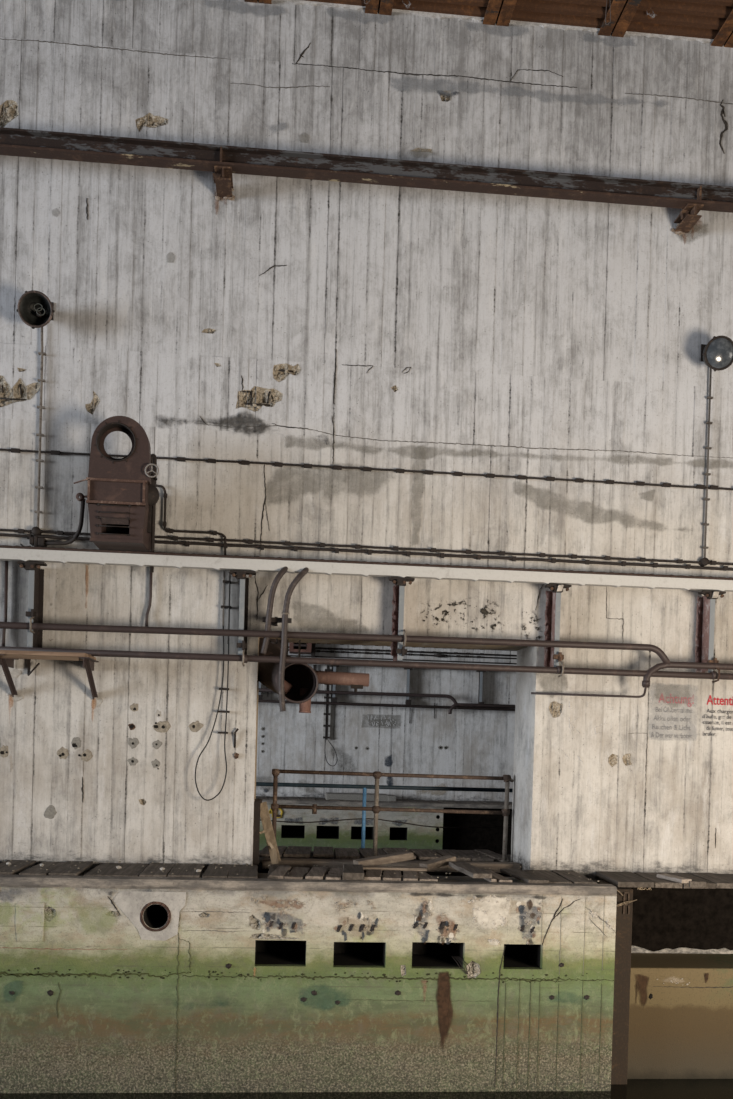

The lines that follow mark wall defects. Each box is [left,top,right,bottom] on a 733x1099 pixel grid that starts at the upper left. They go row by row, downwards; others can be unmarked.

spalling [0,100,19,127]
spalling [135,113,168,132]
crack [625,93,733,154]
spalling [0,368,40,407]
spalling [236,363,301,412]
peeling [249,896,307,940]
peeling [334,900,379,941]
peeling [412,898,460,945]
crack [174,908,250,1090]
rust [422,972,453,1048]
crack [316,894,614,1089]